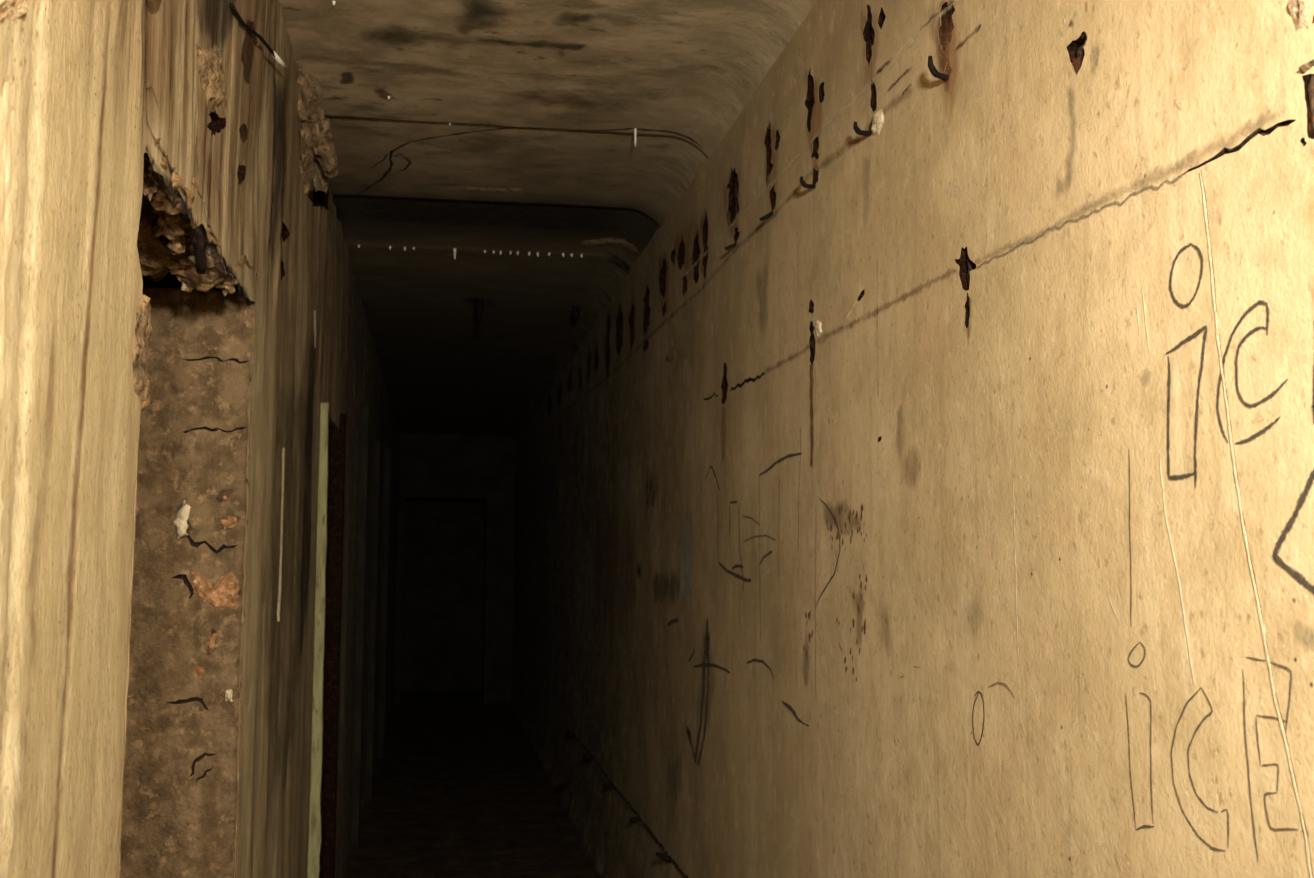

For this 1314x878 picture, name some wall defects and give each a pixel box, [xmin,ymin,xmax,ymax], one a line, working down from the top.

spalling [0,0,29,24]
spalling [1287,0,1314,31]
spalling [1299,59,1314,146]
crack [1184,119,1296,174]
spalling [308,187,329,210]
spalling [146,146,249,300]
crack [183,356,250,364]
crack [703,372,765,400]
crack [183,425,248,433]
crack [172,535,237,599]
crack [167,697,209,711]
crack [189,752,217,783]